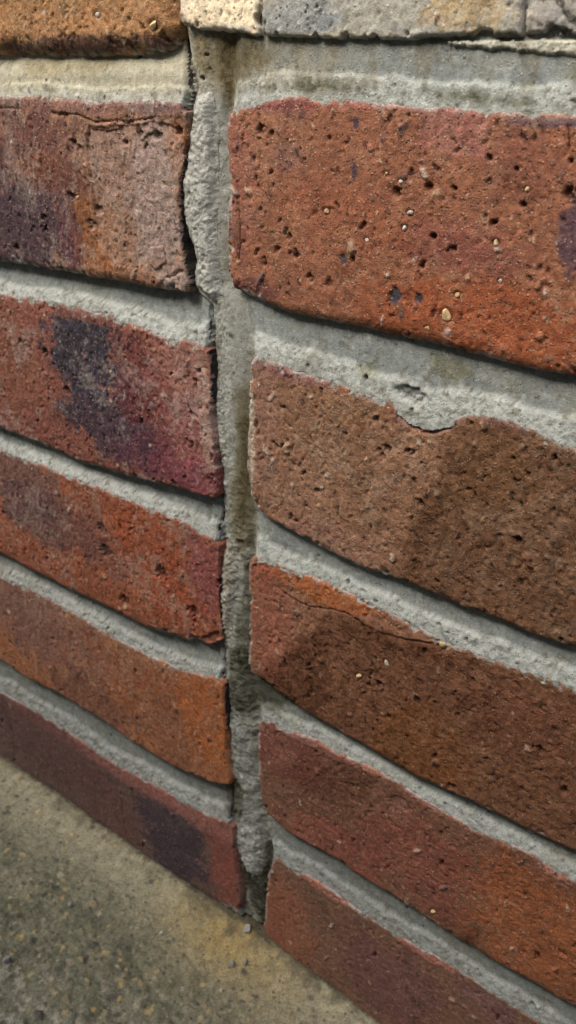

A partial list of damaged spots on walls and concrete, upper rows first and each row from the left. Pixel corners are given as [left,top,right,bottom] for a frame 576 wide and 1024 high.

crack [186,39,194,88]
crack [179,152,197,287]
crack [235,209,243,260]
crack [208,314,218,402]
spalling [395,386,426,403]
crack [217,578,225,631]
crack [222,659,232,731]